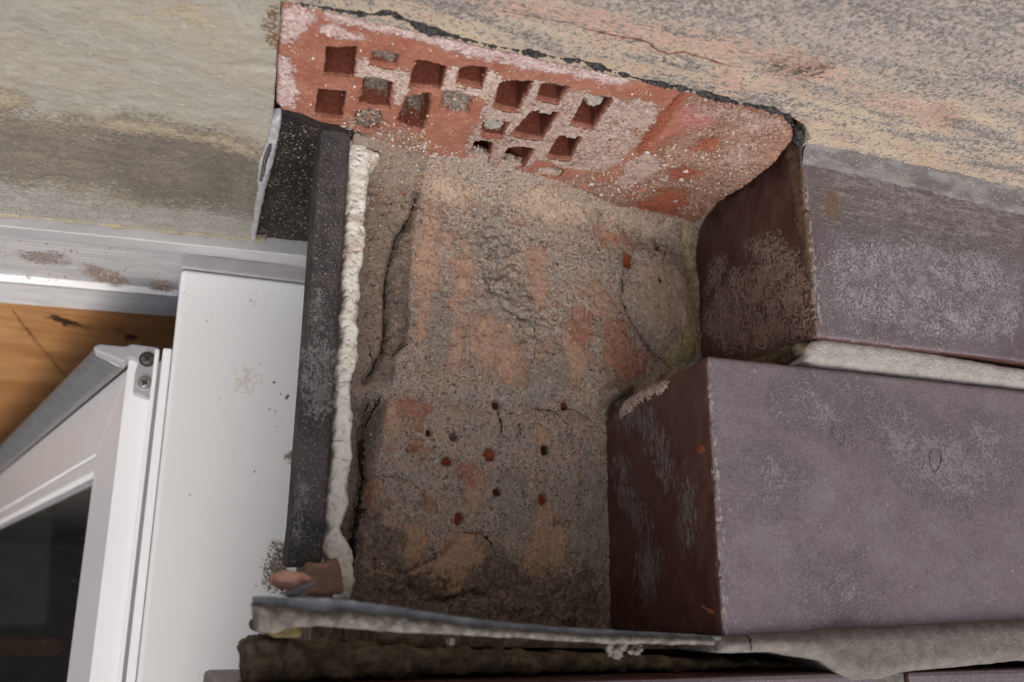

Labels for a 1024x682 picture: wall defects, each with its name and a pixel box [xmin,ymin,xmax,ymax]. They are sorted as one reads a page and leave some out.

leakage [0,86,266,240]
peeling [616,136,771,191]
crack [621,265,671,367]
crack [348,198,426,566]
crack [406,532,495,588]